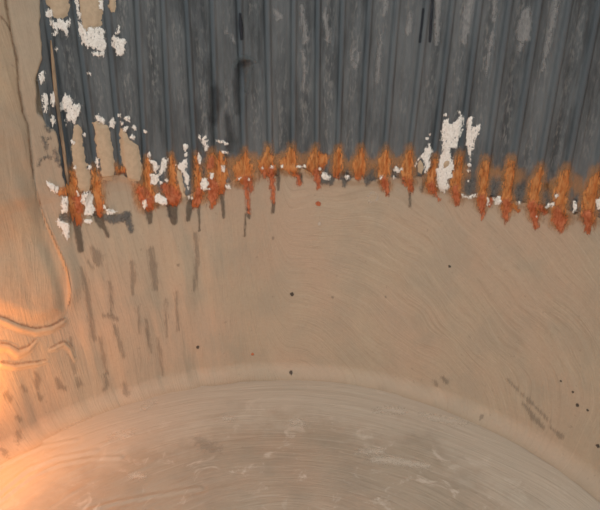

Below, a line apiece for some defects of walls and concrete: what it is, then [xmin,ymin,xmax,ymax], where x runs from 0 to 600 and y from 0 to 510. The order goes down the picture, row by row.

peeling [45,0,126,58]
peeling [40,93,81,127]
peeling [95,113,147,140]
peeling [415,111,481,194]
peeling [46,180,70,241]
corrosion [57,170,85,252]
peeling [76,190,118,224]
corrosion [90,167,109,238]
water stain [100,212,133,233]
corrosion [136,157,155,224]
corrosion [161,147,343,237]
corrosion [476,159,570,232]